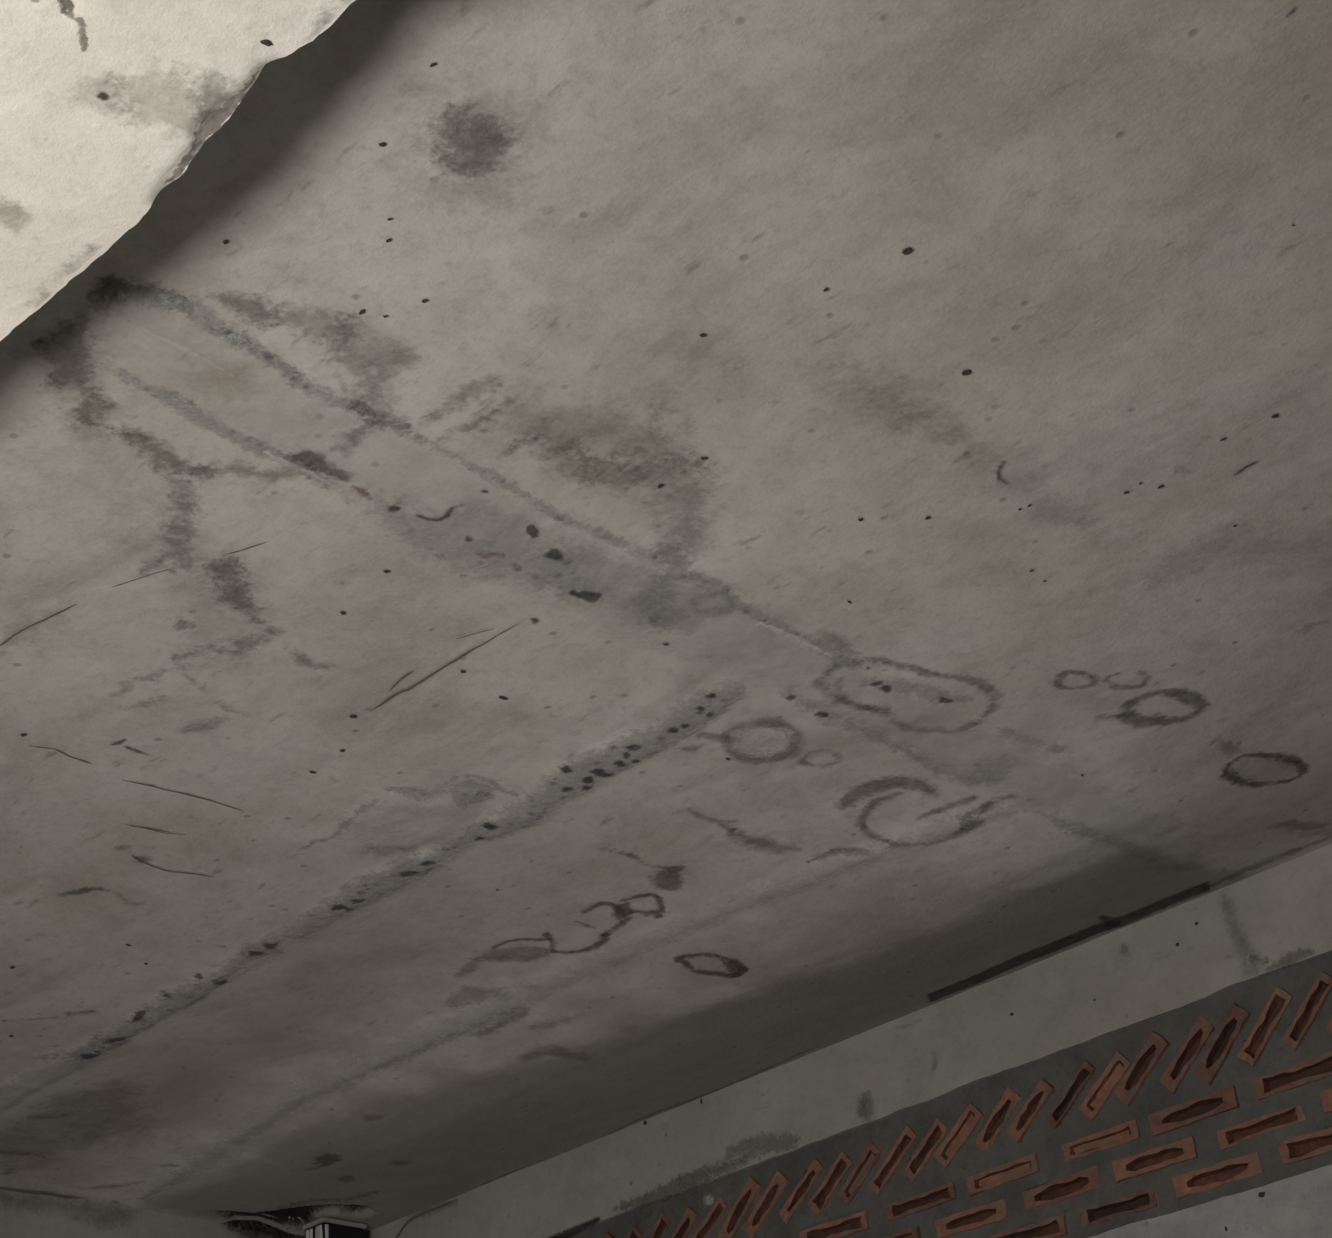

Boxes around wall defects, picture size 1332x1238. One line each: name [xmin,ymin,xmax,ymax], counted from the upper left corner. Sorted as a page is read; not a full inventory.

peeling [57,0,87,52]
water stain [291,451,347,480]
crack [224,542,265,555]
crack [113,568,175,587]
crack [0,604,76,646]
water stain [1122,690,1203,725]
water stain [736,721,789,757]
water stain [1221,753,1307,787]
water stain [493,869,680,953]
water stain [675,953,747,978]